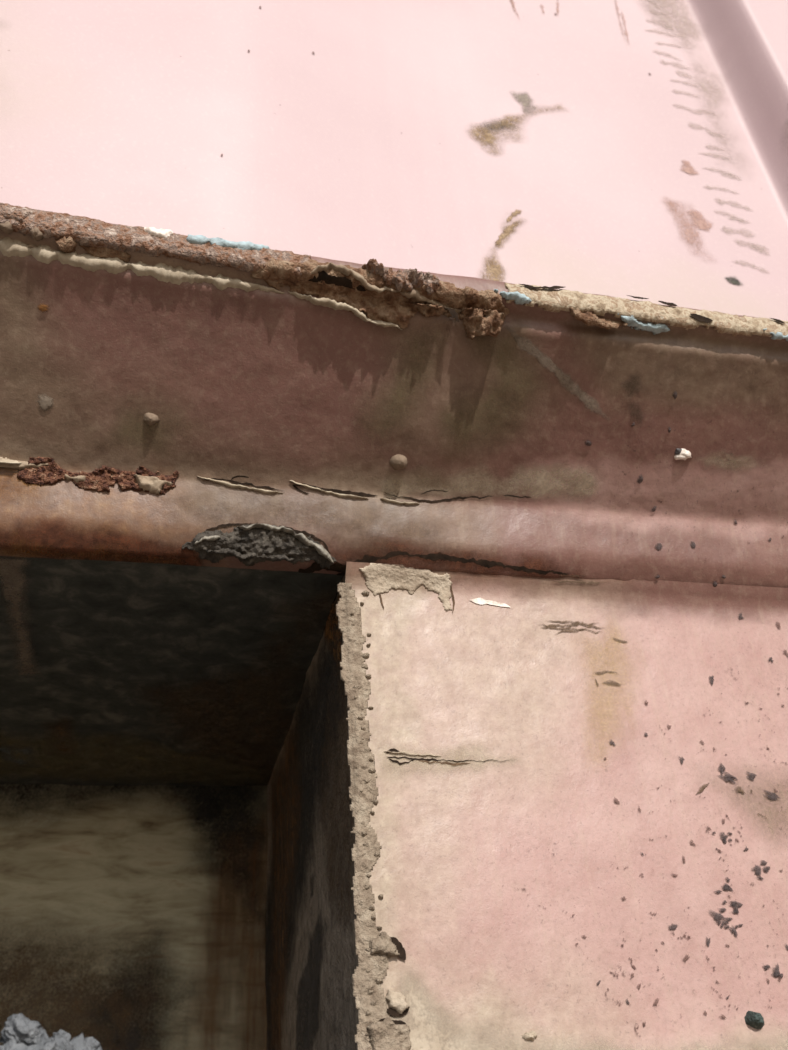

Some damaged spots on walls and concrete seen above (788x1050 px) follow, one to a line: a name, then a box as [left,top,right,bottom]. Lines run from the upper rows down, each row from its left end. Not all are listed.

damp [649,0,735,178]
corrosion [0,203,311,277]
damp [688,210,711,230]
corrosion [362,258,788,341]
corrosion [2,457,179,495]
crack [198,475,531,505]
corrosion [0,522,201,566]
crack [298,551,569,576]
peeling [359,563,455,611]
crack [384,748,507,766]
damp [296,918,323,1050]